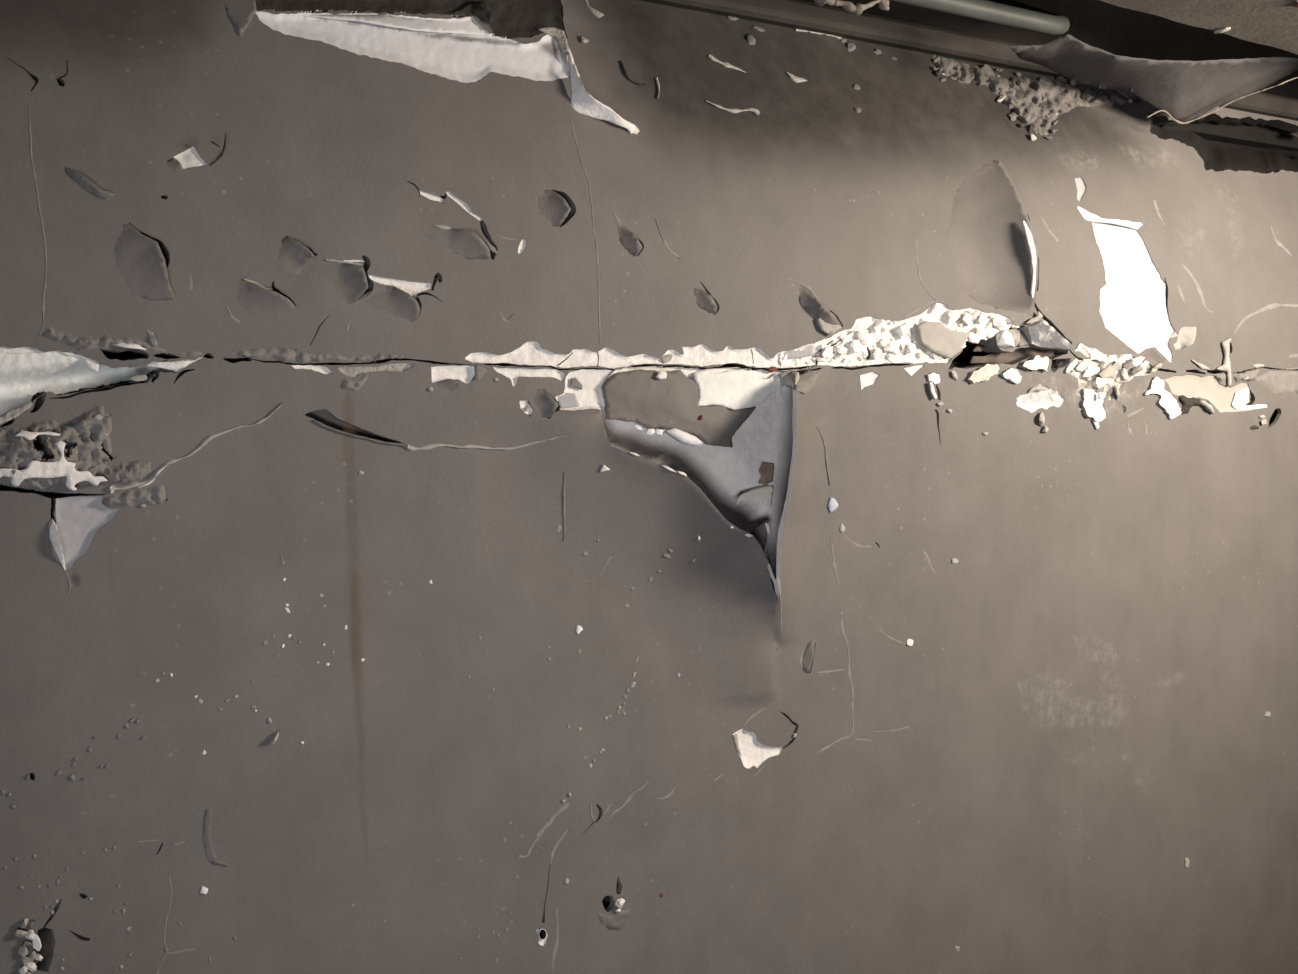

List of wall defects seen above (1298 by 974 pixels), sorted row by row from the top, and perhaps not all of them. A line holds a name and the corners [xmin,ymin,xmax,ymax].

peeling [223,0,639,134]
peeling [408,181,498,260]
crack [0,484,105,499]
spalling [0,329,204,594]
spalling [291,360,415,377]
peeling [304,409,408,447]
crack [0,317,910,428]
peeling [428,160,1278,601]
crack [935,384,952,444]
crack [1158,366,1298,374]
peeling [732,707,798,769]
spalling [15,899,90,974]